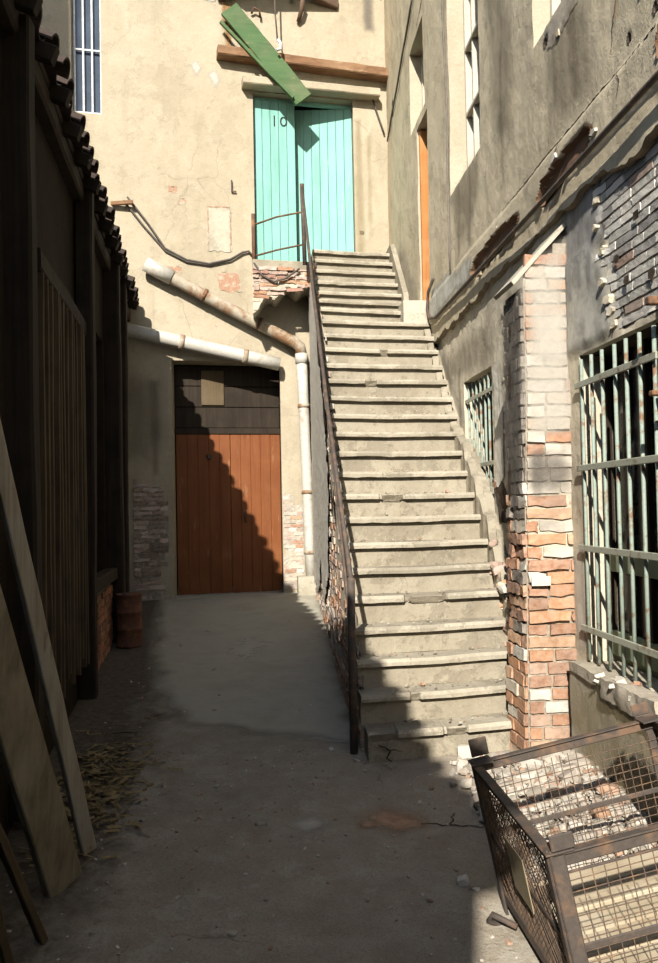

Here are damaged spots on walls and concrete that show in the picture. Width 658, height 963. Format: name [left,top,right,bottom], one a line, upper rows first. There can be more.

flaking render [592,138,658,330]
flaking render [283,282,333,600]